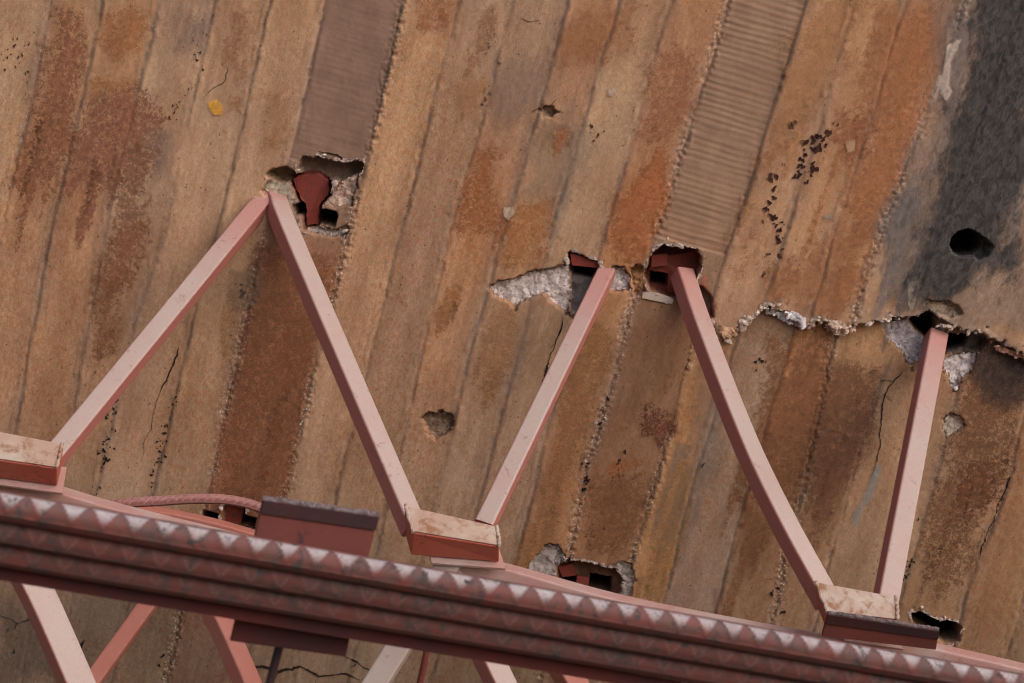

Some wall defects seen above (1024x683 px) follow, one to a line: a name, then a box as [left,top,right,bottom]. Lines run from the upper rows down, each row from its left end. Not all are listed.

rust [2,2,166,375]
spalling [262,151,366,206]
spalling [298,220,349,238]
rust [602,45,699,274]
spalling [490,236,703,318]
spalling [712,280,1024,391]
spalling [422,411,453,438]
crack [872,370,902,477]
spalling [527,544,636,596]
spalling [907,606,965,647]